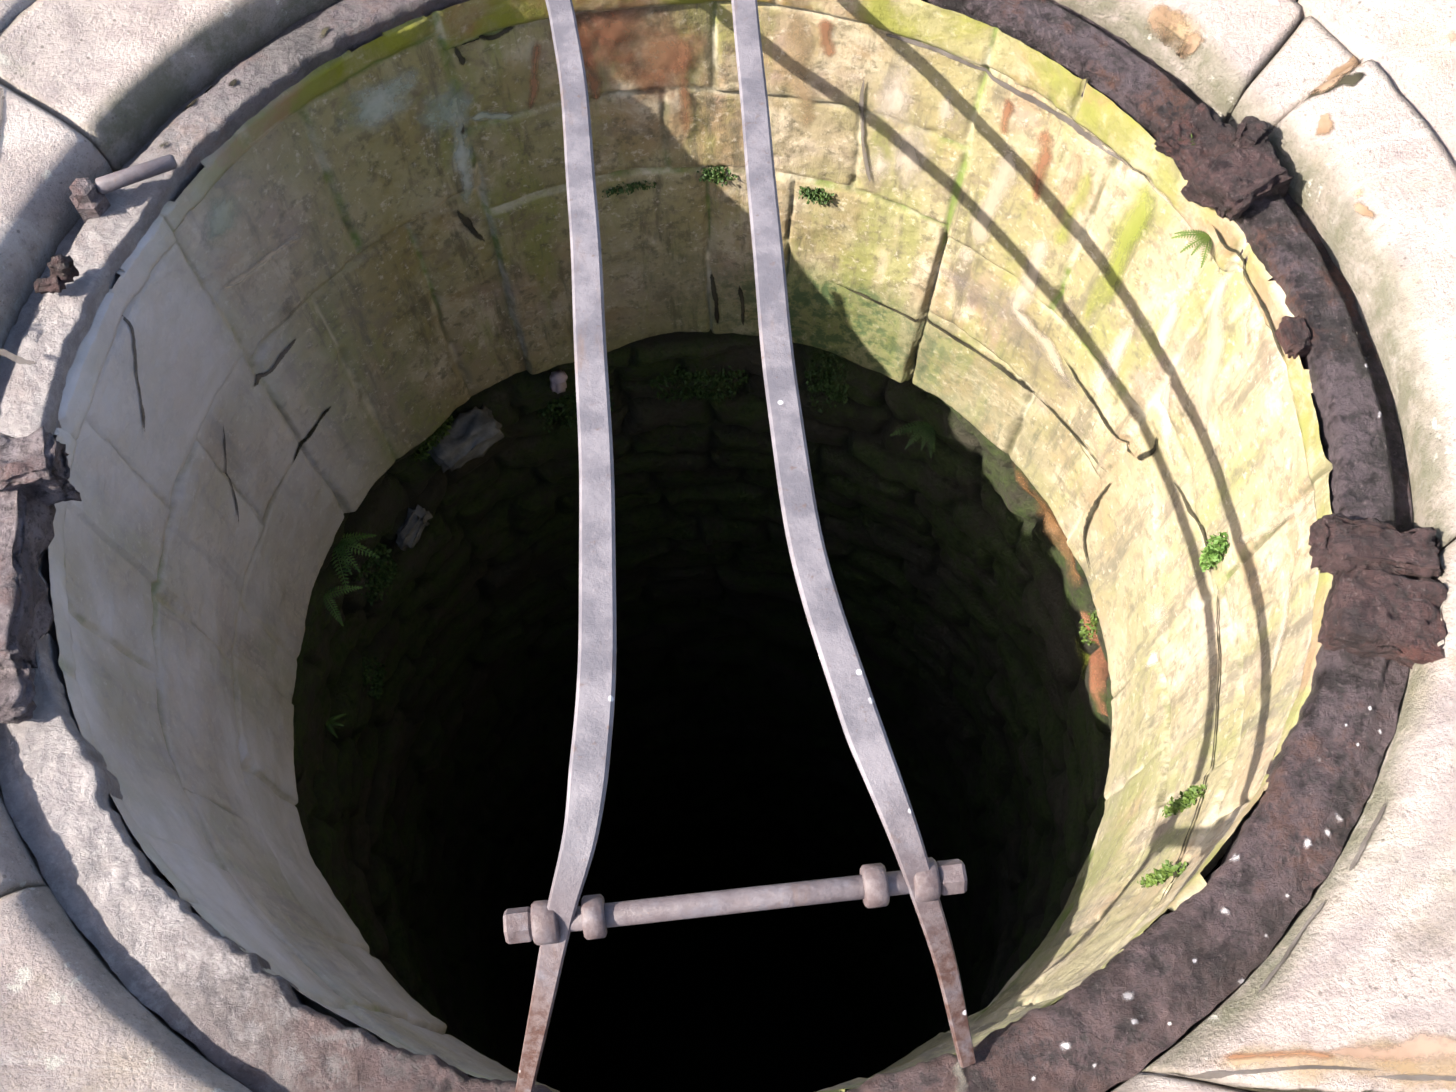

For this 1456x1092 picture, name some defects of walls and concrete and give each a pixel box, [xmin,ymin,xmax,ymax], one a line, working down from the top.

corrosion [578,9,702,131]
corrosion [1001,100,1013,133]
corrosion [1032,132,1051,199]
damp [1087,187,1151,313]
crack [710,274,745,325]
crack [837,284,1157,571]
crack [1174,483,1207,547]